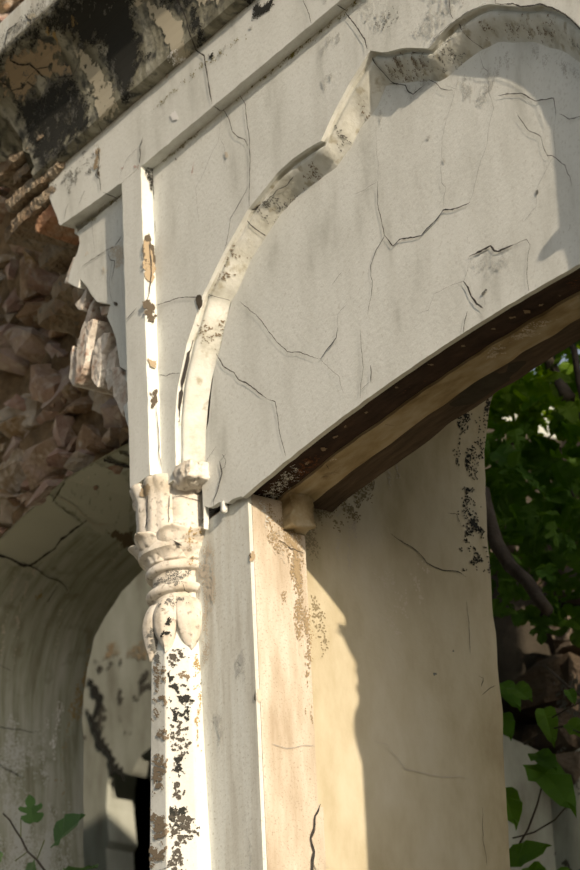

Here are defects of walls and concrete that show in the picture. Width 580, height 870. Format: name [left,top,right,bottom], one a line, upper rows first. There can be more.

water stain [0,0,152,194]
crack [64,108,120,218]
crack [176,0,294,246]
crack [338,0,580,332]
crack [83,237,372,393]
crack [156,341,193,469]
crack [216,354,286,456]
mould [453,396,492,573]
crack [0,520,87,601]
crack [393,535,466,577]
crack [310,804,321,870]